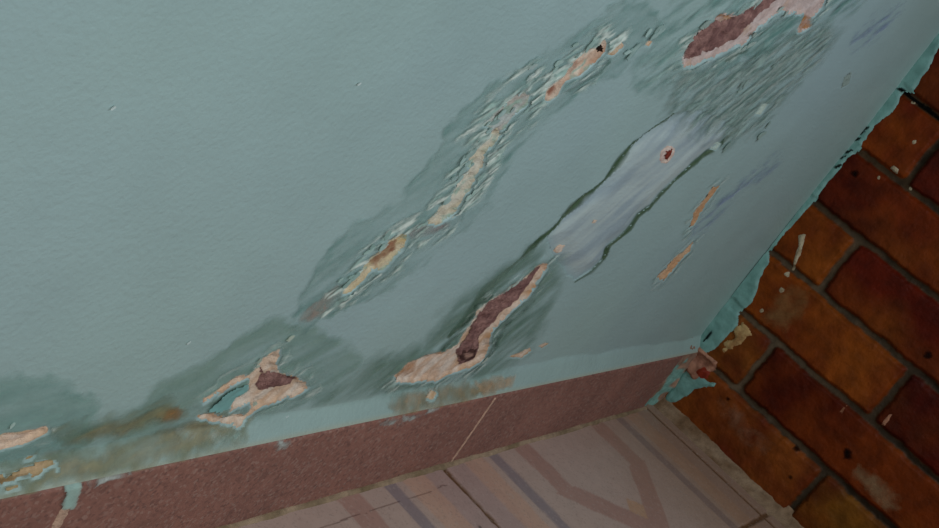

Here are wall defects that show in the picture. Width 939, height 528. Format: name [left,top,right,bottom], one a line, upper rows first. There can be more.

spalling [680,0,833,70]
spalling [322,24,628,318]
spalling [382,244,565,400]
spalling [0,422,48,450]
spalling [0,456,53,491]
spalling [197,335,318,438]